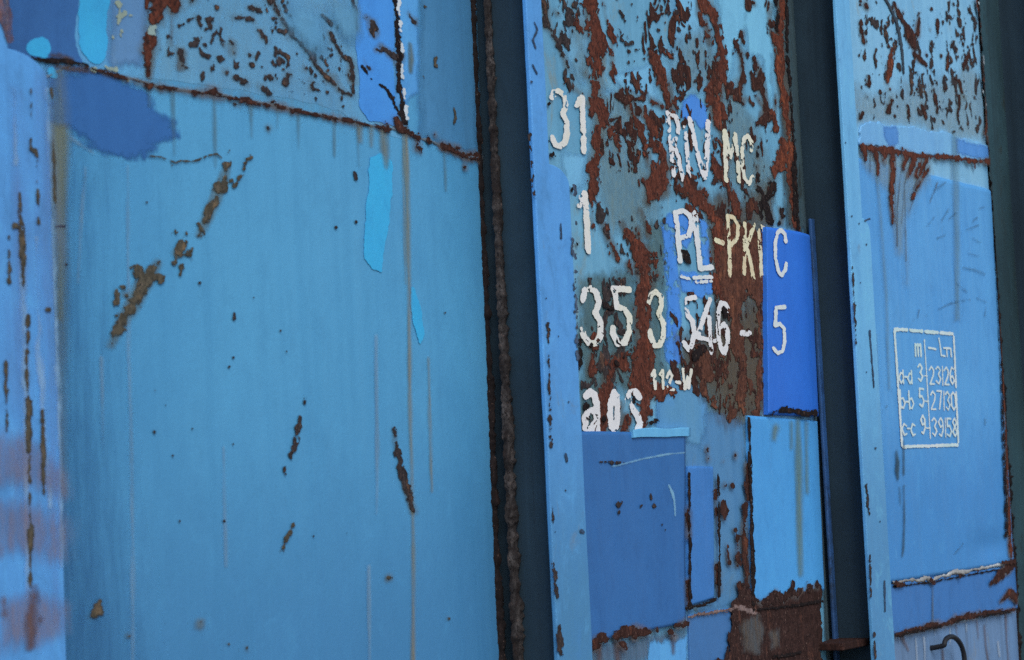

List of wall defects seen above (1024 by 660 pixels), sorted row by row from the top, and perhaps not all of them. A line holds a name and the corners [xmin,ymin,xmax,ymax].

rust [886,47,894,91]
rust [892,1,928,67]
rust [52,0,481,269]
rust [563,0,818,432]
rust [860,96,991,246]
rust [546,322,554,448]
rust [895,327,1018,650]
rust [27,592,41,649]
rust [551,562,559,599]
rust [556,624,564,655]
rust [592,454,823,660]